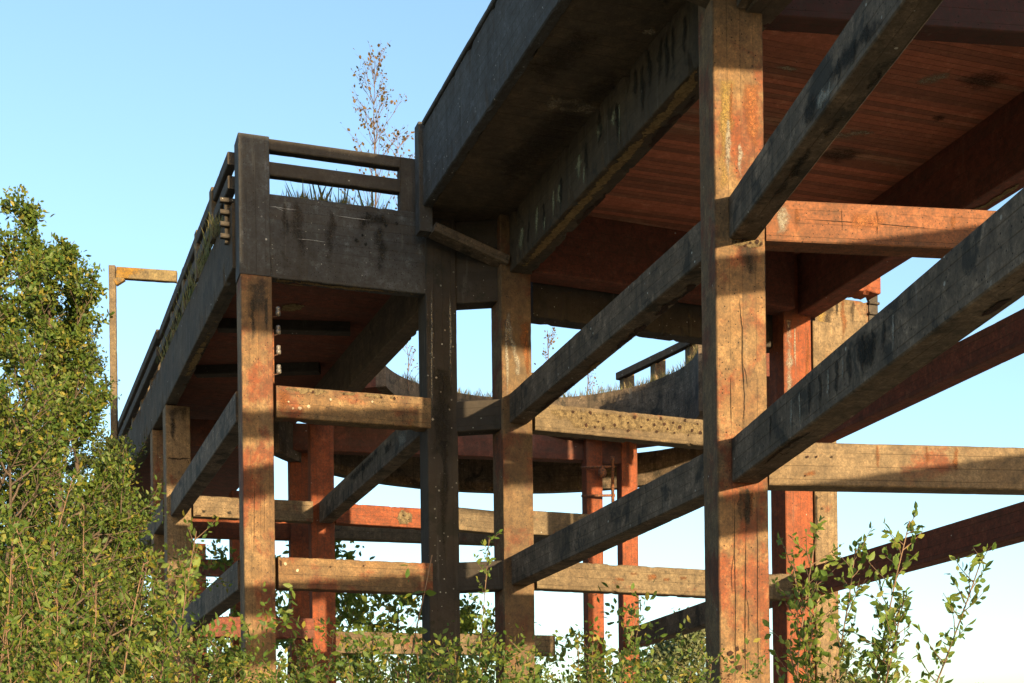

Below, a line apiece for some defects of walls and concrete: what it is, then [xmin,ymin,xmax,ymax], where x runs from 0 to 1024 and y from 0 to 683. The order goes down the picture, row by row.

peeling [612,325,647,352]
spalling [541,382,702,436]
leakage [738,489,753,524]